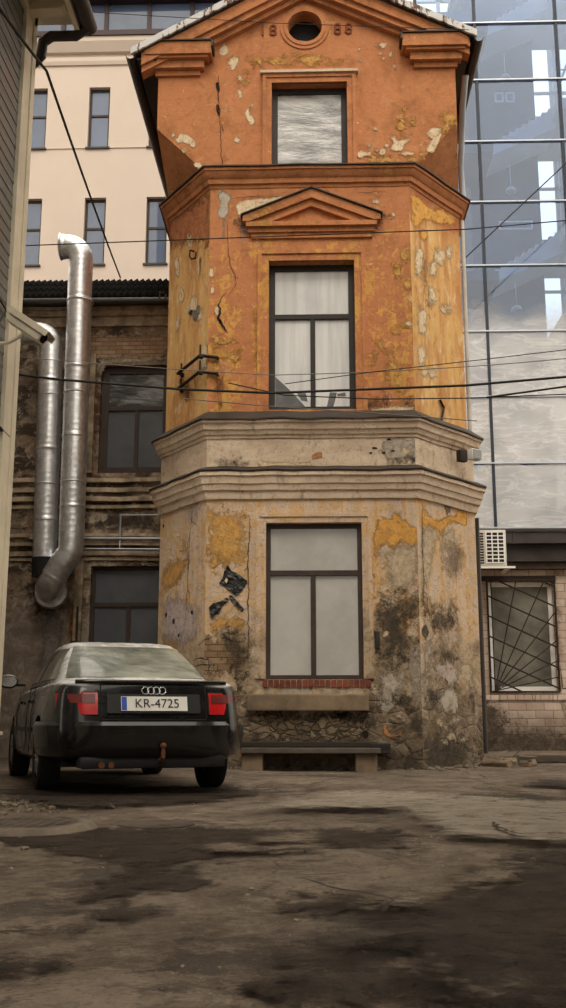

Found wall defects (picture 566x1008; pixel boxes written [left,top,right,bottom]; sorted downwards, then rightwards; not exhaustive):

peeling [171,132,205,169]
crack [216,76,224,165]
peeling [357,101,457,163]
flaking render [90,189,284,375]
crack [217,225,236,333]
peeling [369,191,456,411]
peeling [206,503,251,583]
peeling [372,505,469,595]
damp [216,622,250,695]
damp [374,584,459,674]
damp [245,706,376,742]
damp [387,688,469,770]